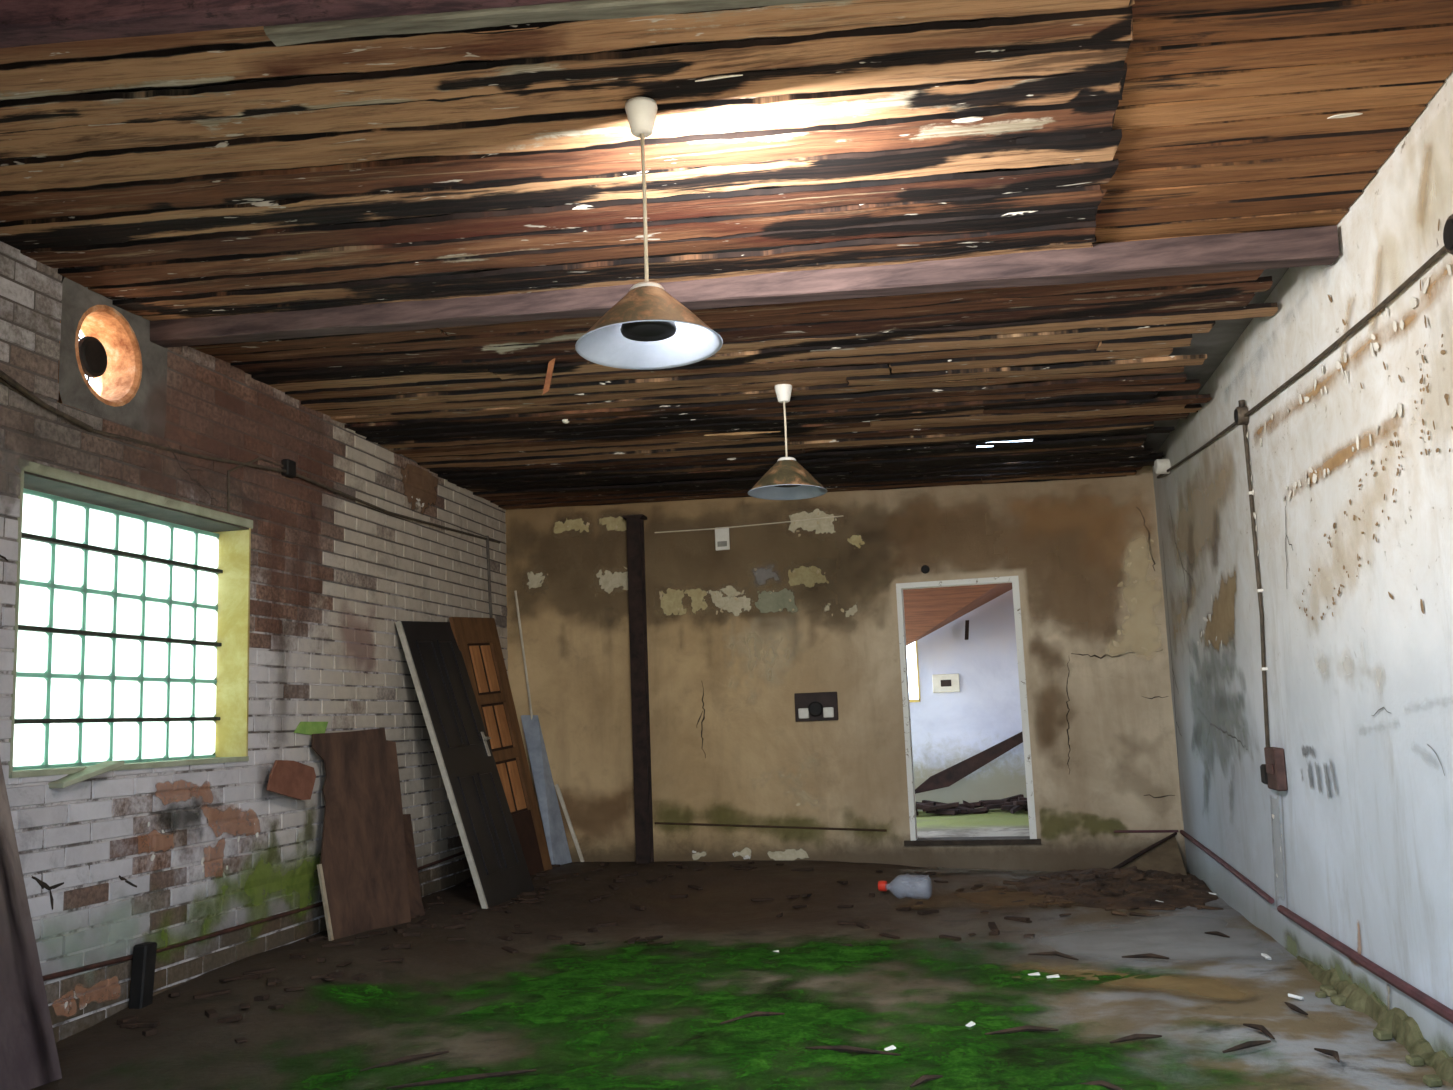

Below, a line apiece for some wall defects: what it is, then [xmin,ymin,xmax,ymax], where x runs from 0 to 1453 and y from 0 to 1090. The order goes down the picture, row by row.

peeling [1247,264,1453,547]
peeling [554,516,627,534]
peeling [788,509,865,549]
peeling [527,571,548,589]
peeling [596,567,628,594]
peeling [659,566,829,616]
peeling [824,602,858,617]
flaking render [1197,570,1236,651]
flaking render [1299,554,1369,620]
crack [1066,505,1247,810]
peeling [155,780,261,879]
leakage [305,812,313,839]